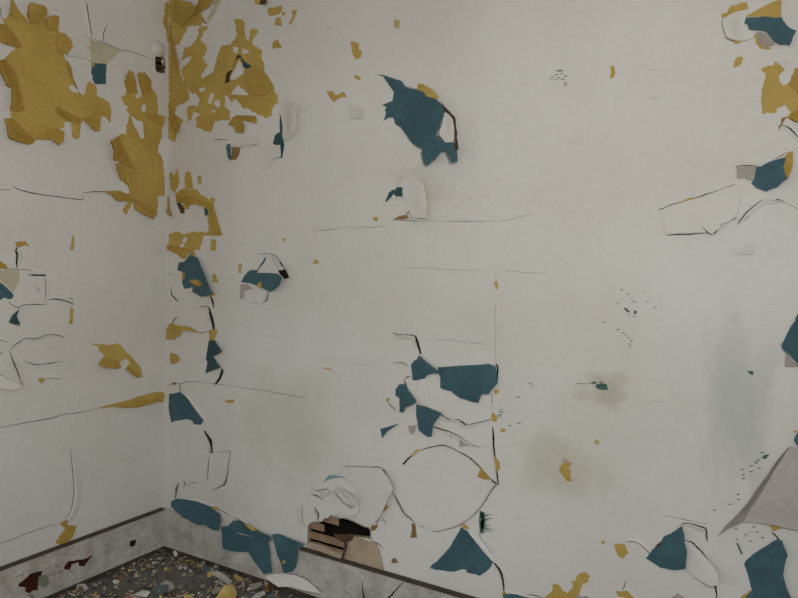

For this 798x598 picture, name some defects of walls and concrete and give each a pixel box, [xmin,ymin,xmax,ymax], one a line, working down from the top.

peeling [721,0,796,50]
peeling [0,0,299,308]
peeling [378,74,459,166]
peeling [761,59,798,130]
crack [672,199,797,235]
crack [0,295,75,386]
peeling [386,332,506,448]
peeling [176,498,267,535]
flaking render [307,515,398,570]
crack [392,427,500,538]
peeling [740,524,791,598]